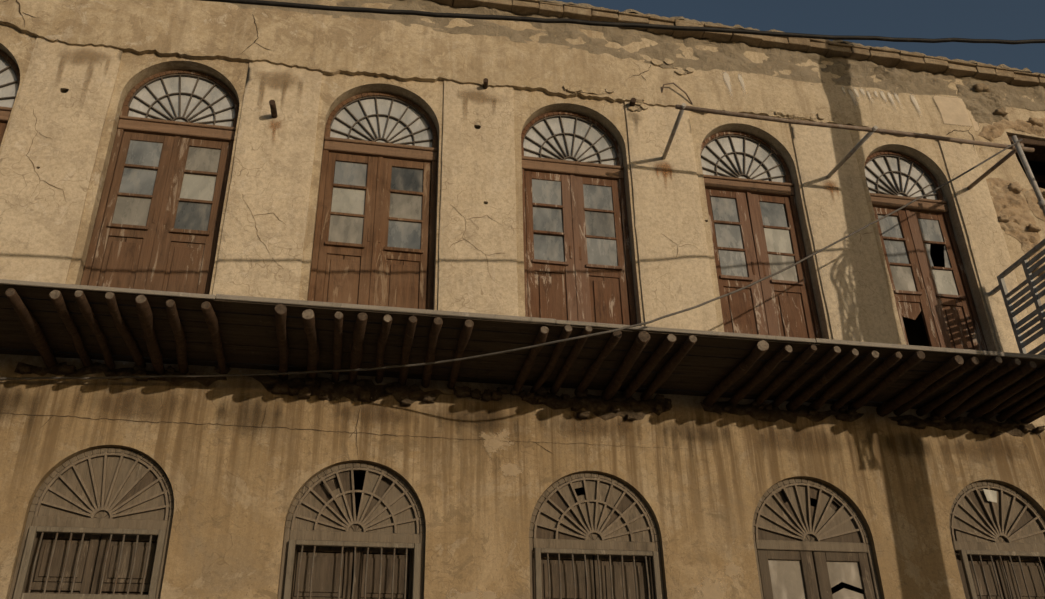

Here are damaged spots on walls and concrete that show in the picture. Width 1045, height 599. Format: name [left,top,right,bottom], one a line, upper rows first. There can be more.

spalling [231,0,1045,141]
crack [6,406,712,454]